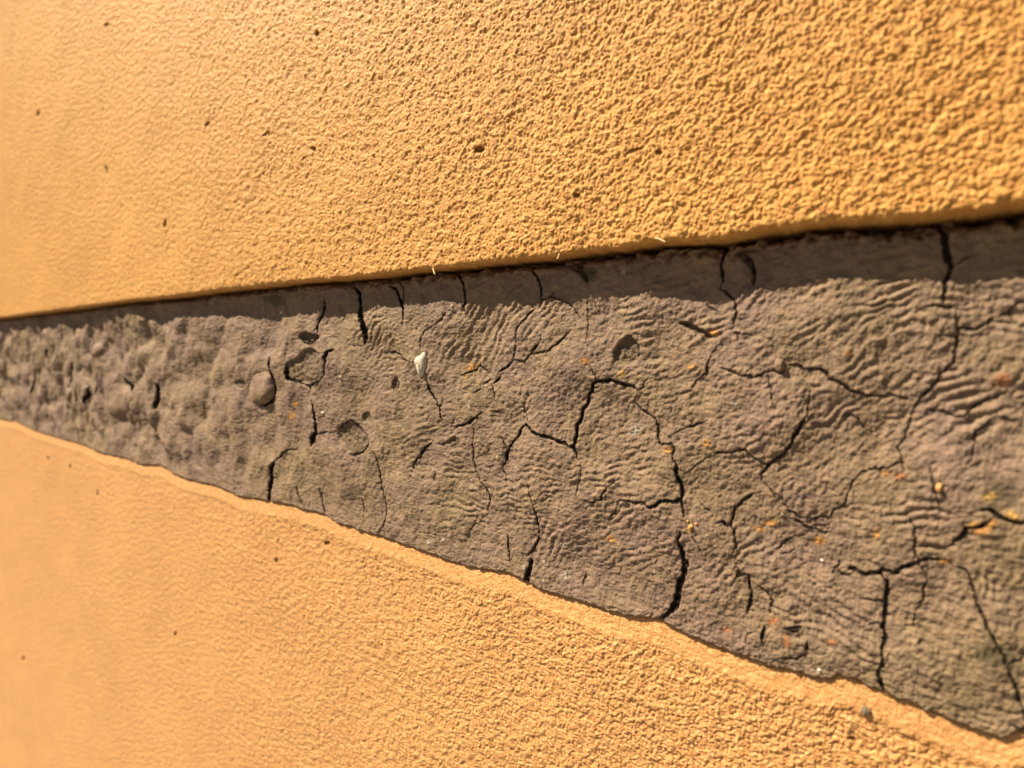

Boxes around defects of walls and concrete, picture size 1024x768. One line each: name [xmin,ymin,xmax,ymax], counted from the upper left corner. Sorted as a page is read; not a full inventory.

spalling [738,254,756,287]
spalling [284,332,333,389]
crack [316,299,326,334]
crack [355,275,466,362]
spalling [613,335,641,365]
spalling [679,321,713,340]
crack [267,401,329,512]
spalling [340,411,371,456]
spalling [437,436,460,449]
crack [412,225,1019,660]
crack [359,448,387,534]
crack [832,509,1024,730]